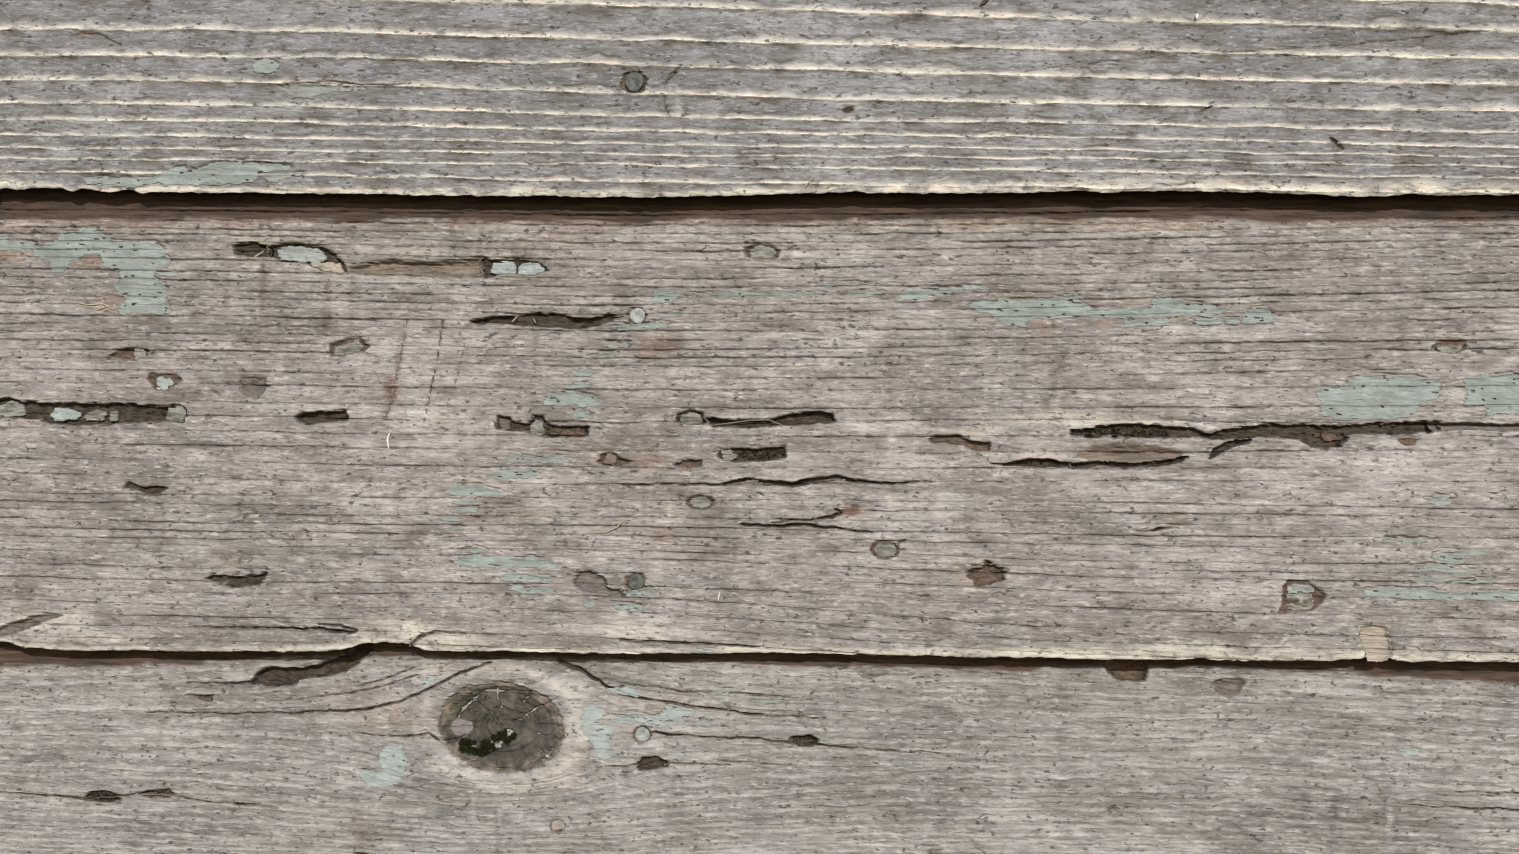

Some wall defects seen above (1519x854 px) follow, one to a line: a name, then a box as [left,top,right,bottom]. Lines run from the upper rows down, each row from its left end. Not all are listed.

peeling [0,226,176,317]
crack [469,312,625,330]
peeling [1315,374,1443,421]
peeling [1461,373,1519,416]
crack [673,409,836,429]
crack [928,434,992,453]
crack [1069,420,1519,460]
spalling [1398,435,1418,446]
crack [620,474,931,545]